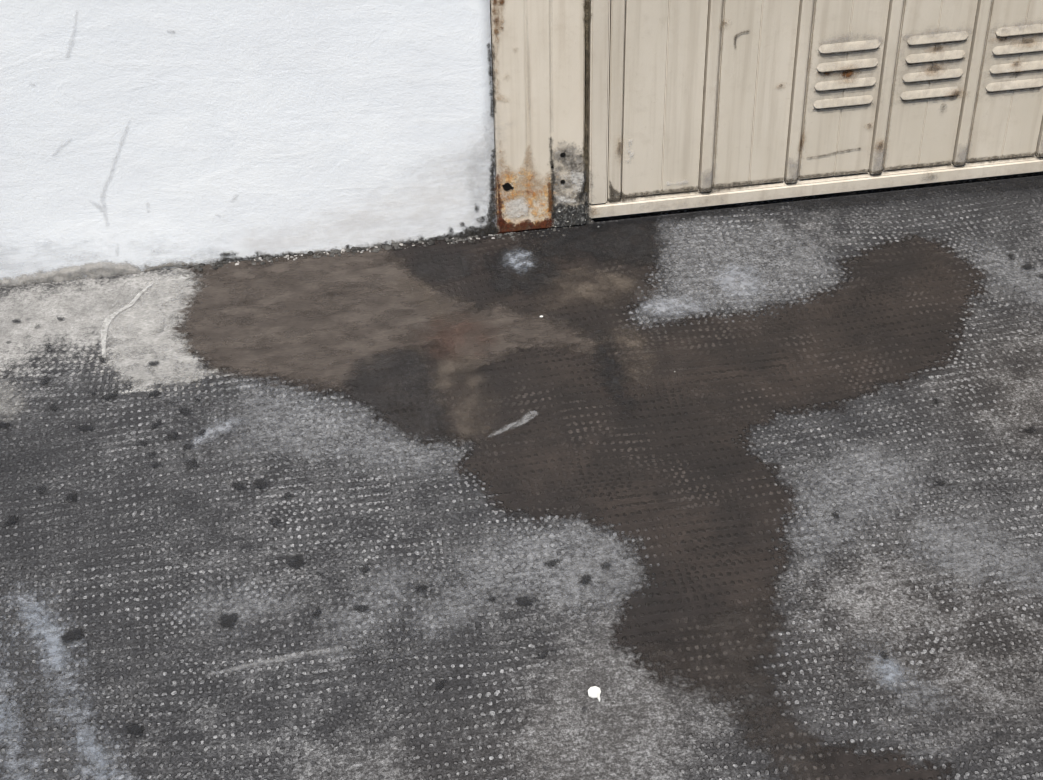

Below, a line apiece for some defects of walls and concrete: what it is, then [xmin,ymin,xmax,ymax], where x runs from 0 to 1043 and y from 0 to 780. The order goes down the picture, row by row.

damp [487,44,496,117]
rust [495,152,553,234]
damp [175,150,1043,780]